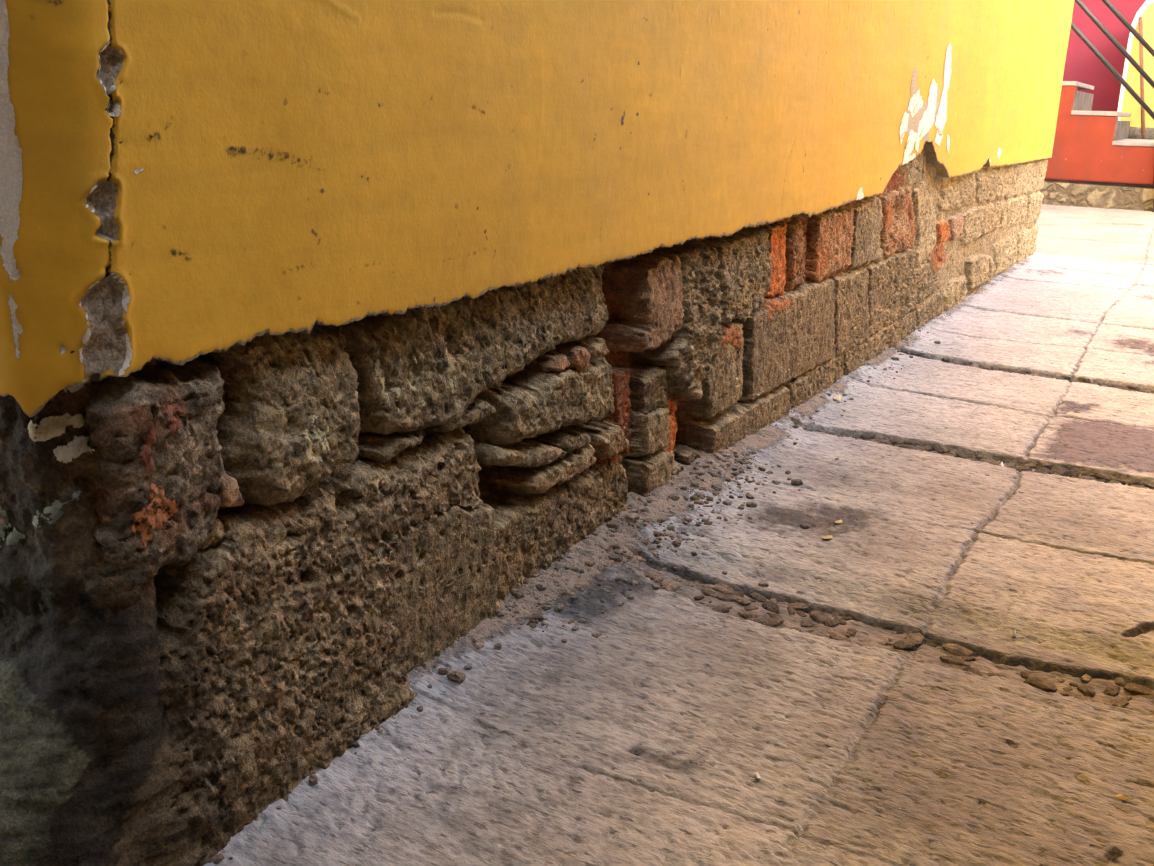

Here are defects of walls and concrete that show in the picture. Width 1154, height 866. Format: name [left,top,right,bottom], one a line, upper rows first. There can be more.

peeling [0,0,23,281]
crack [70,0,133,382]
peeling [0,43,1052,463]
water stain [1037,401,1154,472]